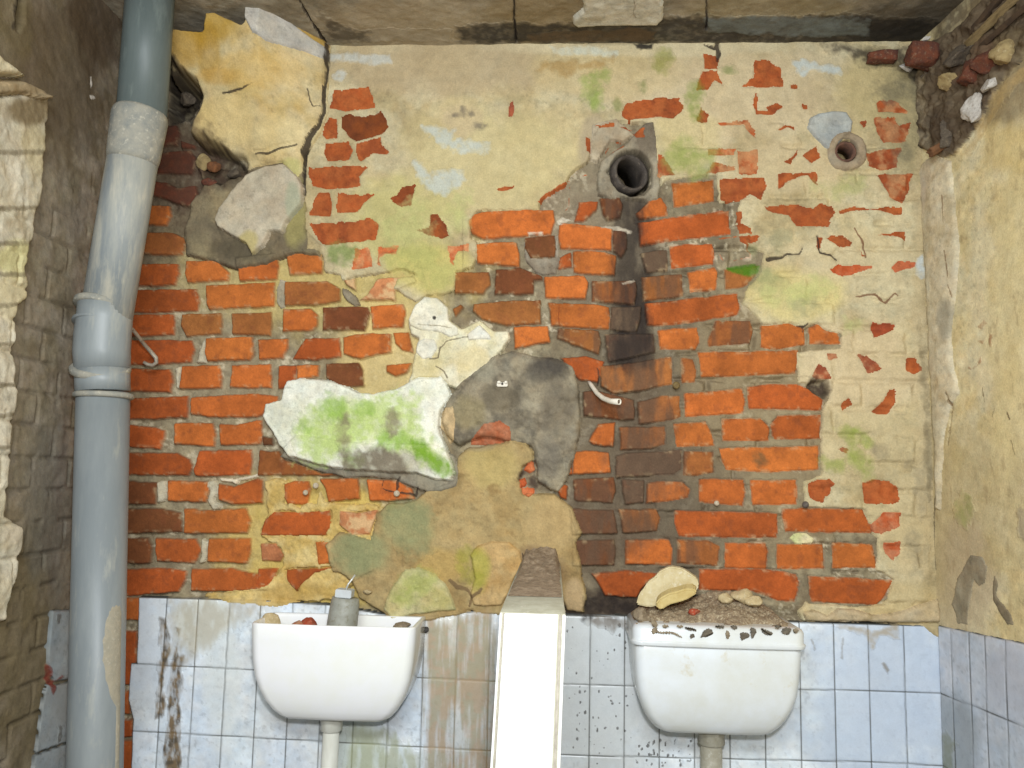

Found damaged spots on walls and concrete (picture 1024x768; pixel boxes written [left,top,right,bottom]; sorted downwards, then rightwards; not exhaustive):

crack [255,0,330,196]
peeling [184,7,942,637]
efflorescence [601,225,632,234]